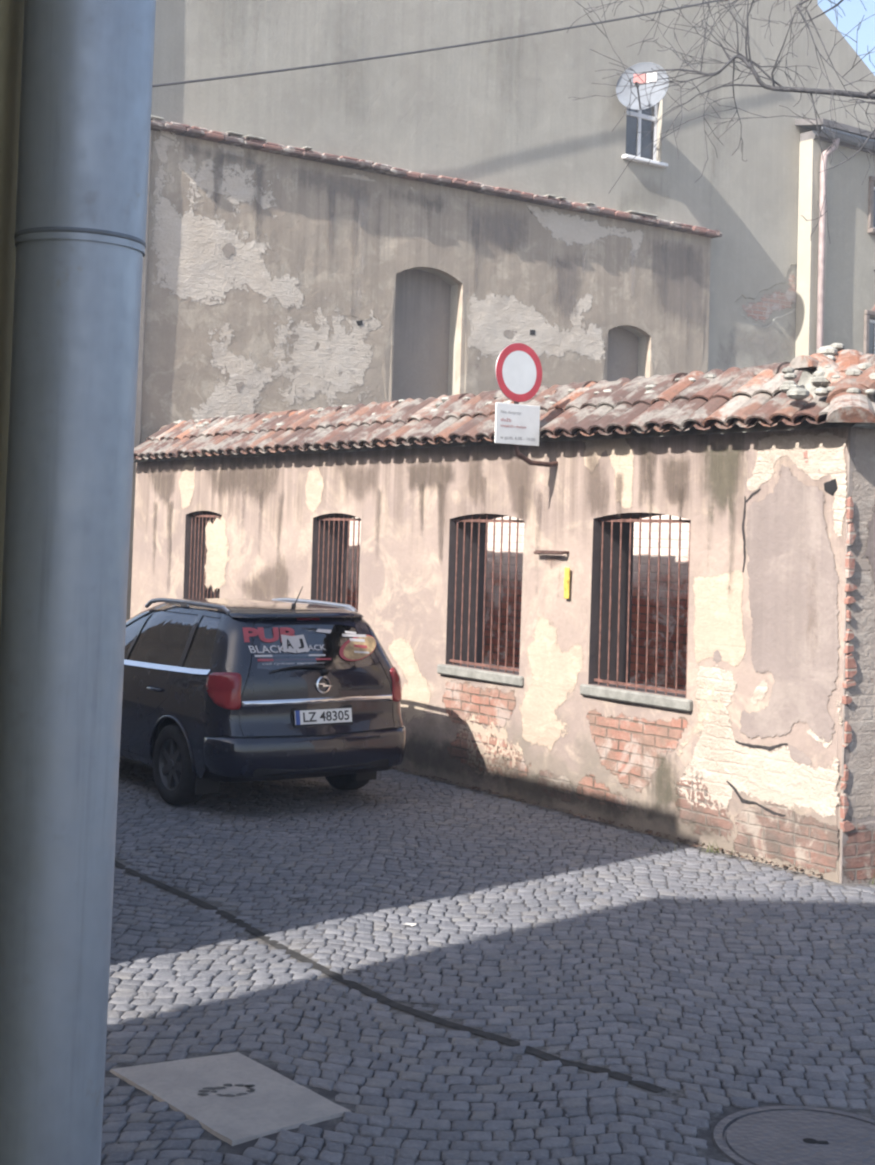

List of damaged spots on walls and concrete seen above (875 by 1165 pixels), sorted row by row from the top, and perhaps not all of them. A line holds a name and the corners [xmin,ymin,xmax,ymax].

peeling [149,130,386,421]
peeling [465,289,605,360]
leakage [152,472,173,532]
leakage [409,464,450,542]
leakage [468,460,484,496]
leakage [507,461,540,515]
leakage [249,564,285,599]
spalling [388,428,875,884]